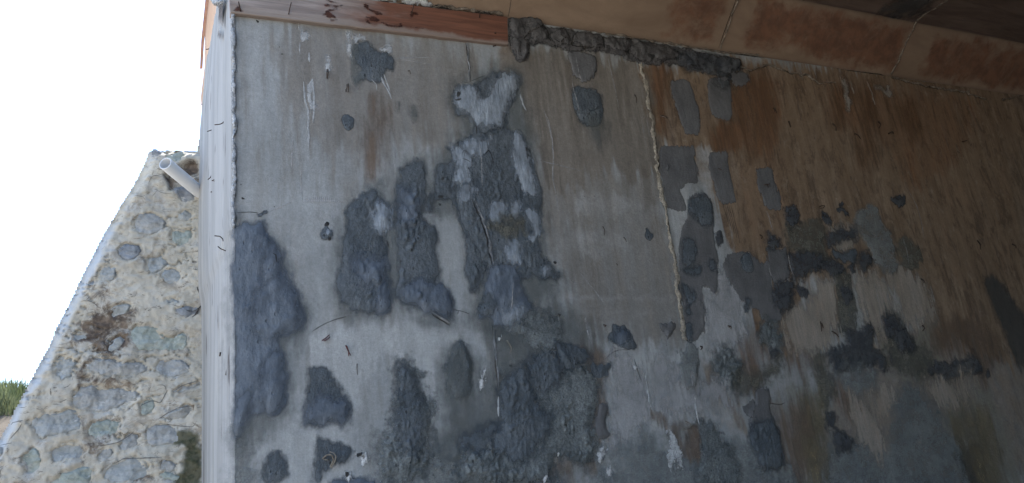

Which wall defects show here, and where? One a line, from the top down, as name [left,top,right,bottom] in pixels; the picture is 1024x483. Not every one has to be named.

leakage [682,259,717,342]
leakage [931,274,1024,386]